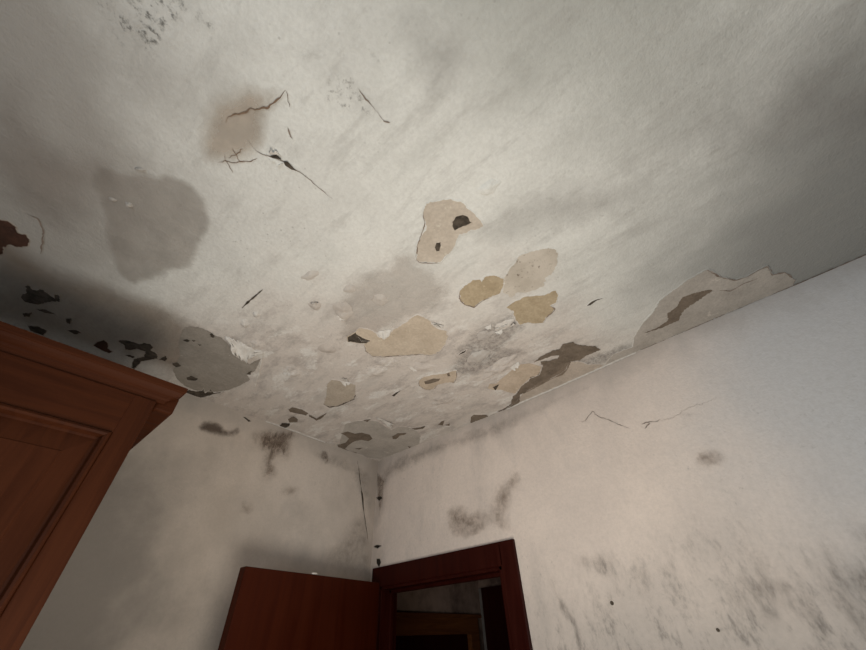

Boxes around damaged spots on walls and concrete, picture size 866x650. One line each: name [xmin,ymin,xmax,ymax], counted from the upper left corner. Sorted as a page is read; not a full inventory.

damp [215,100,255,151]
crack [226,91,290,121]
crack [223,129,331,198]
peeling [414,197,484,264]
peeling [21,284,61,336]
peeling [93,327,264,398]
peeling [347,313,458,390]
peeling [458,247,559,335]
peeling [469,264,797,423]
peeling [280,378,357,428]
peeling [337,417,425,459]